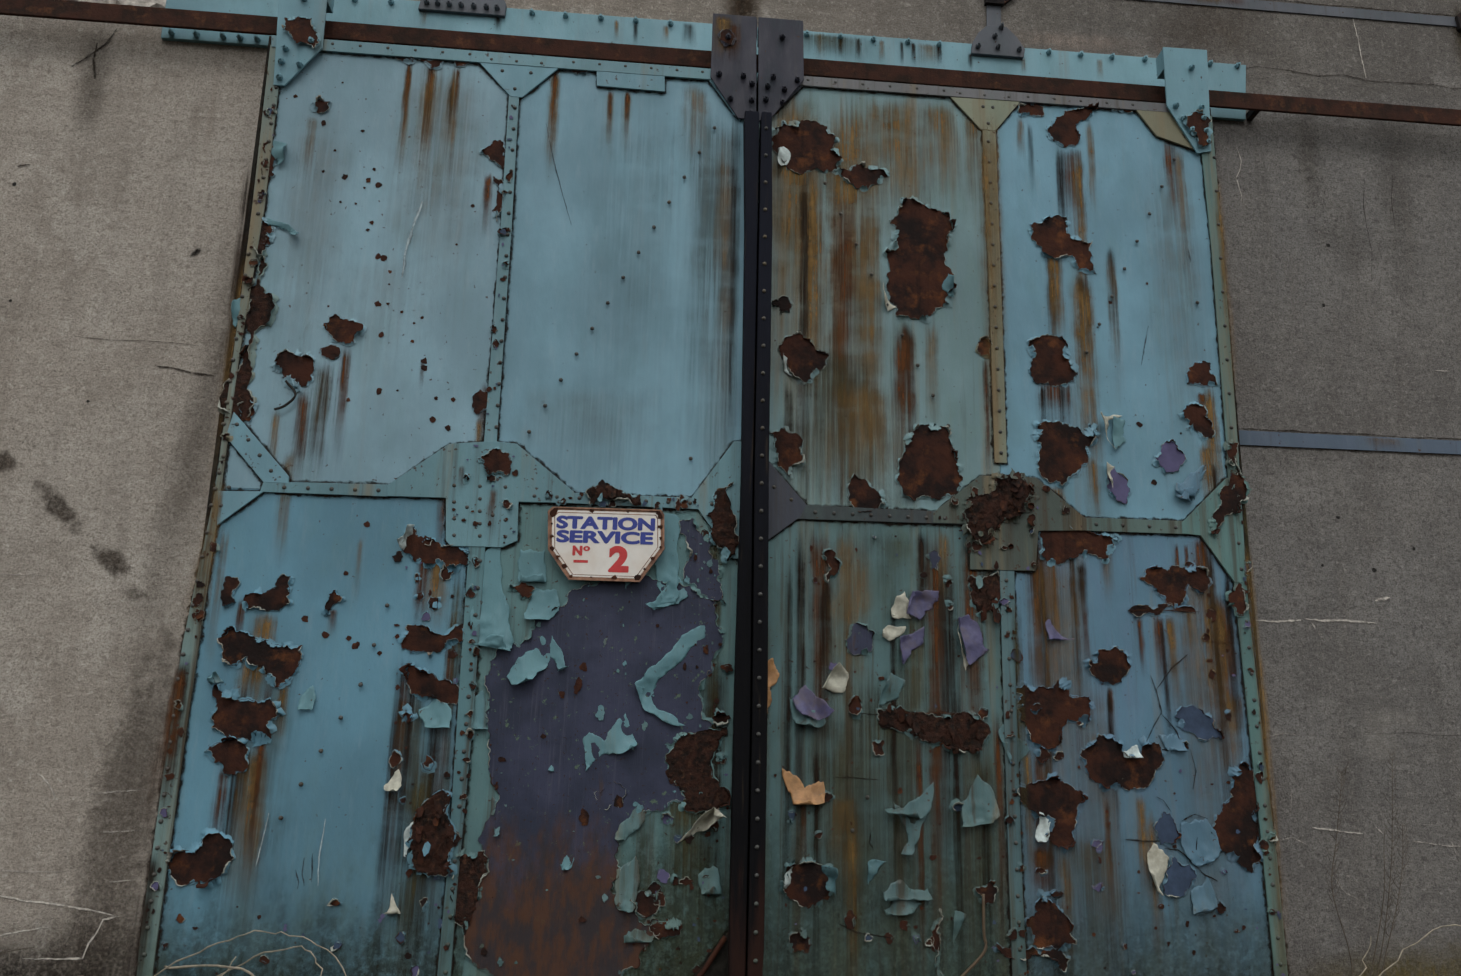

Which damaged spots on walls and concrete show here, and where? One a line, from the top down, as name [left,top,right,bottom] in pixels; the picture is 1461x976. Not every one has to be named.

spalling [69,0,166,8]
rust [773,105,996,301]
rust [1165,143,1184,204]
rust [1108,252,1116,304]
damp [0,452,15,470]
damp [42,485,75,521]
damp [94,550,126,572]
peeling [769,102,1281,976]
rust [1175,541,1237,729]
peeling [378,383,739,976]
peeling [767,658,779,713]
rust [785,536,1048,951]